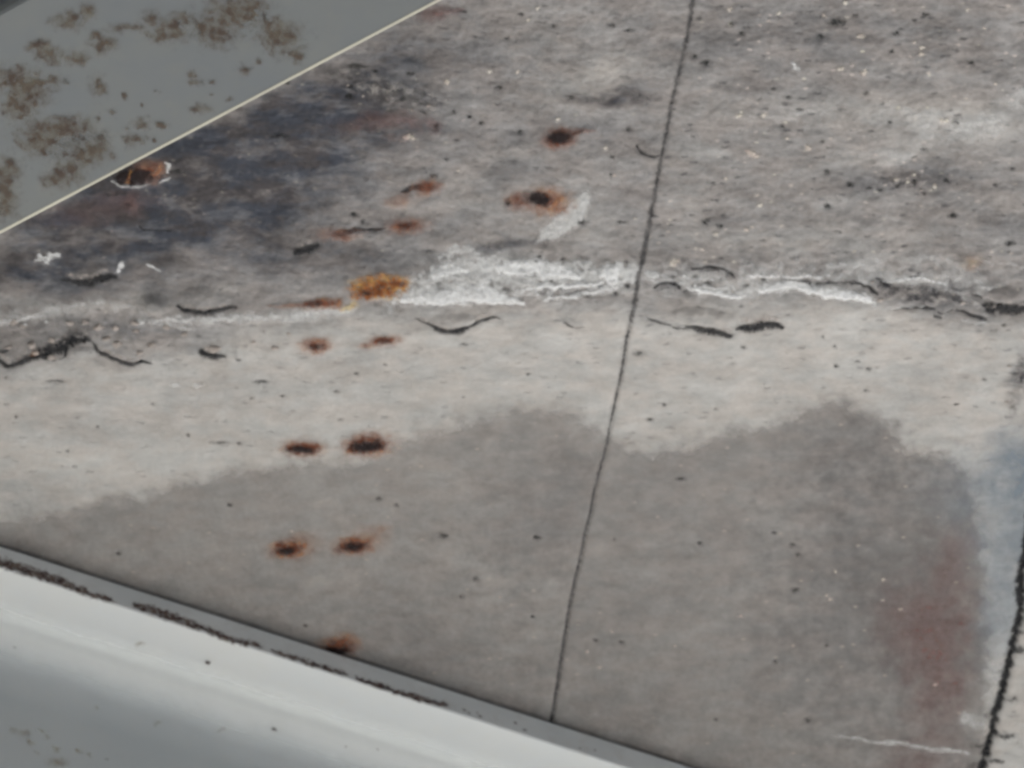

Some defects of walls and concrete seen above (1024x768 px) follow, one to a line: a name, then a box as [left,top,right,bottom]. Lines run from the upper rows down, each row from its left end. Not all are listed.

corrosion [546,130,579,147]
corrosion [506,190,565,212]
corrosion [283,274,408,311]
leakage [393,245,659,306]
crack [653,266,735,289]
leakage [679,275,876,305]
crack [647,318,784,338]
crack [0,334,151,368]
corrosion [285,443,321,456]
corrosion [346,434,386,455]
leakage [0,401,994,768]
corrosion [133,602,448,707]